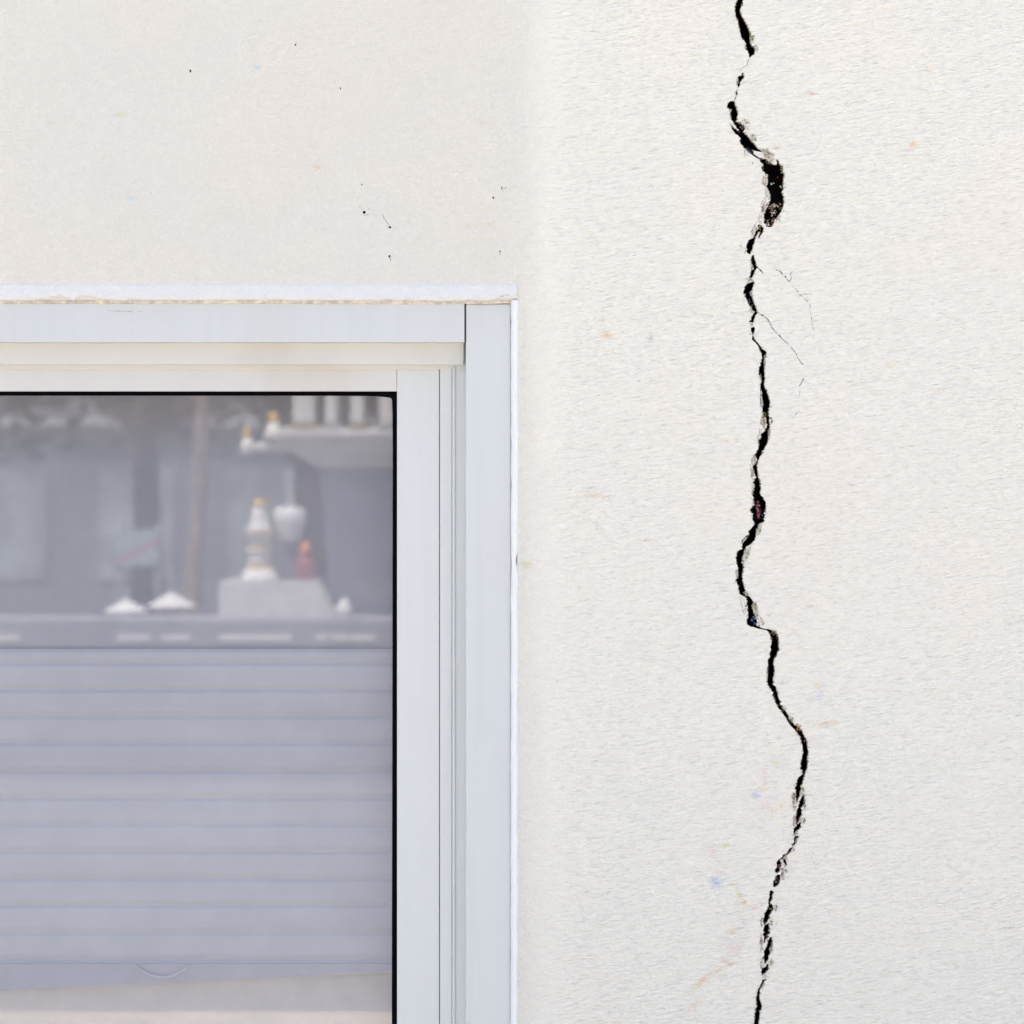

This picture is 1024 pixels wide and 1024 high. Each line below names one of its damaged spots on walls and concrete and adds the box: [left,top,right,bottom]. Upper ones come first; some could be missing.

crack [726,0,814,1024]